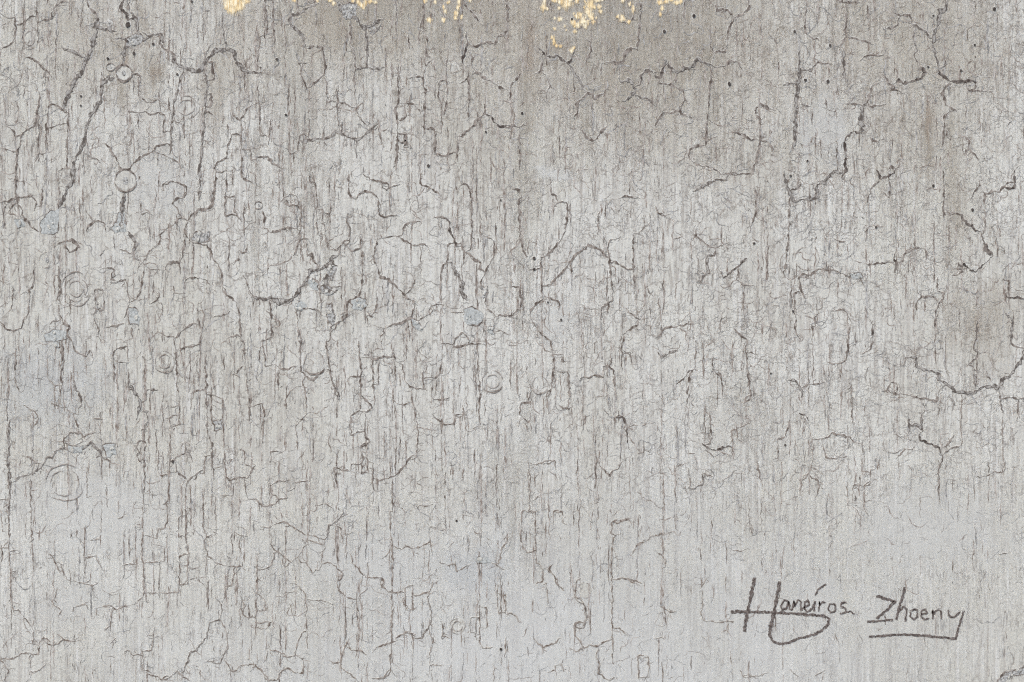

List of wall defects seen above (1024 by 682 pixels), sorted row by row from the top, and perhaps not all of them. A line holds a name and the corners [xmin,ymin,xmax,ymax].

spalling [463,285,495,334]
crack [439,536,471,580]
crack [690,519,750,563]
crack [939,521,1007,585]
crack [691,567,734,640]
crack [441,620,454,658]
crack [488,629,534,682]
crack [654,631,706,682]
crack [717,650,768,682]
crack [805,632,843,682]
crack [879,612,948,682]
crack [962,616,1024,682]